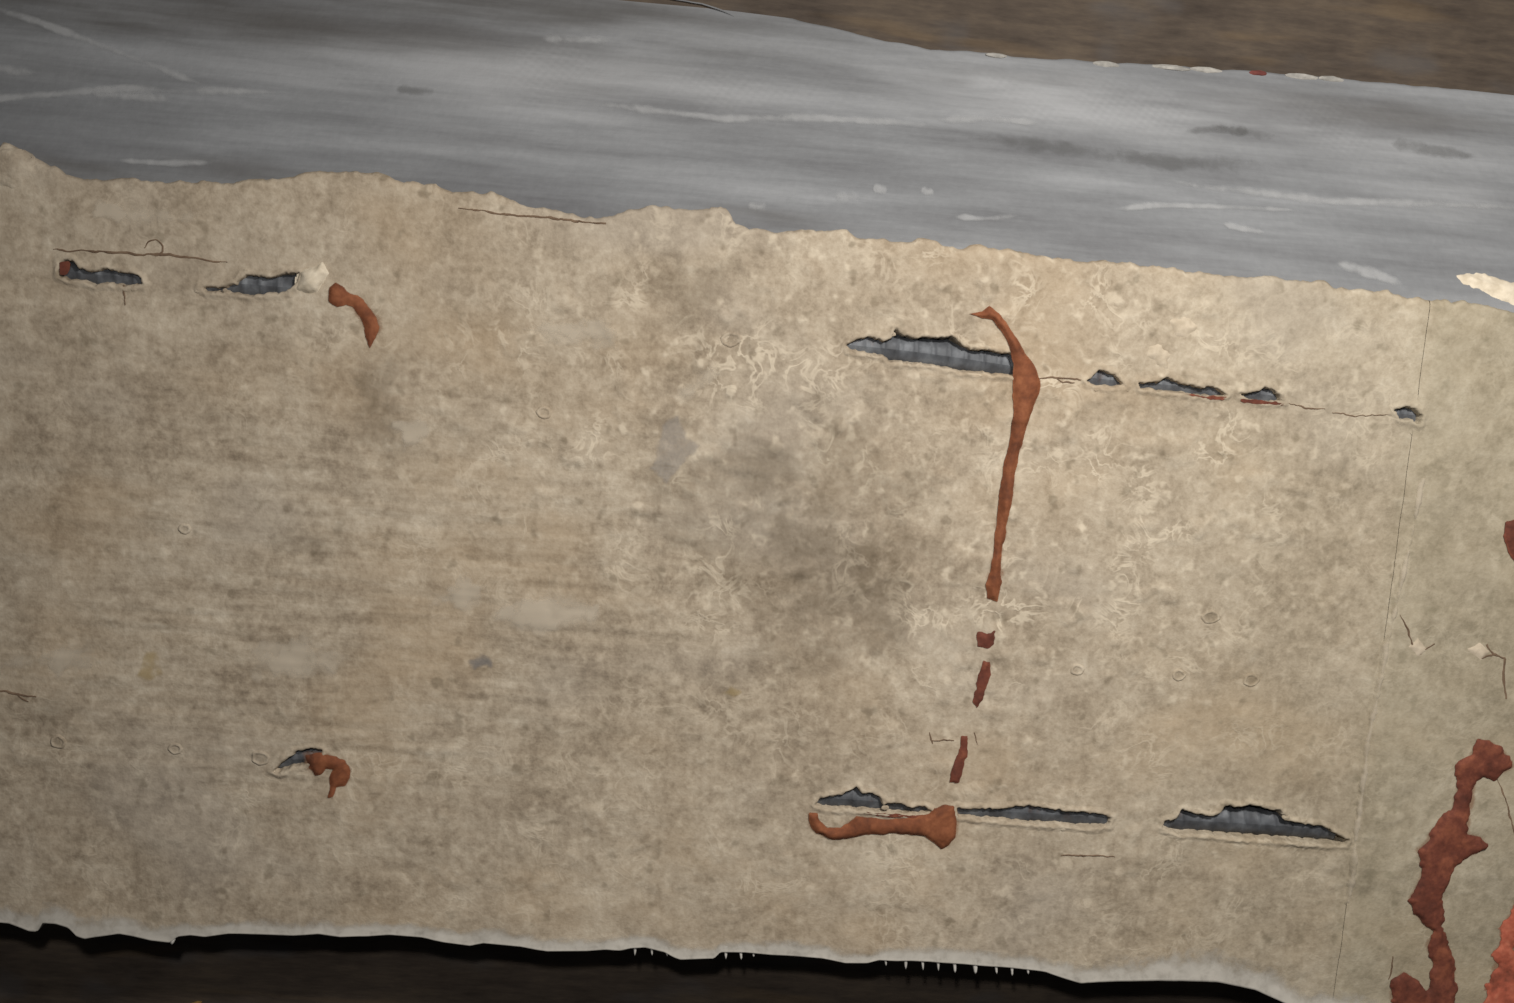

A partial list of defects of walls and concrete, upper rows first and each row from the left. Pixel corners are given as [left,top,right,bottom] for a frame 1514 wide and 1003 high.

spalling [51,251,152,294]
spalling [192,265,305,304]
rust [329,283,379,347]
spalling [839,321,1014,384]
spalling [1079,361,1290,410]
rust [971,306,1041,602]
rust [973,631,995,707]
rust [950,736,968,783]
rust [809,804,957,849]
spalling [808,780,1118,835]
spalling [1156,797,1354,854]
rust [1390,739,1514,1003]